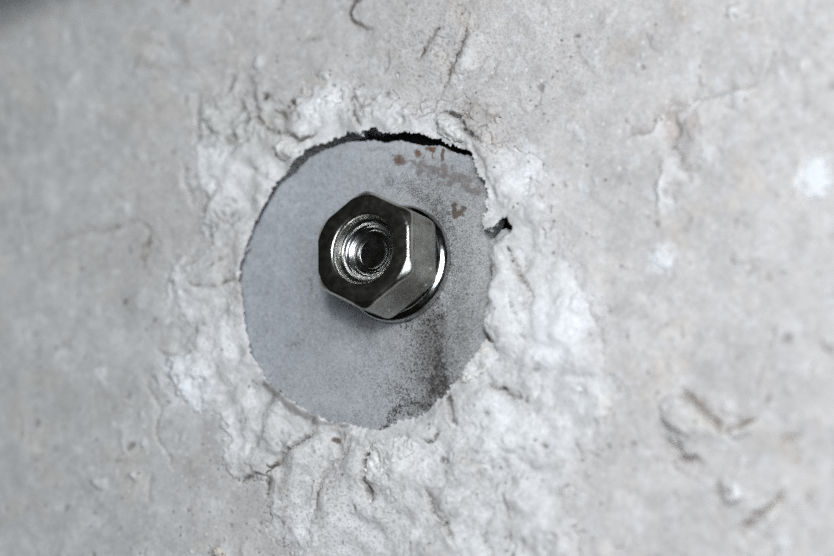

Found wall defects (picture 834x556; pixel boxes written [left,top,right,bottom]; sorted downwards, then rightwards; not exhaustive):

corrosion [394,147,481,195]
corrosion [451,202,466,218]
flaking render [160,34,630,556]